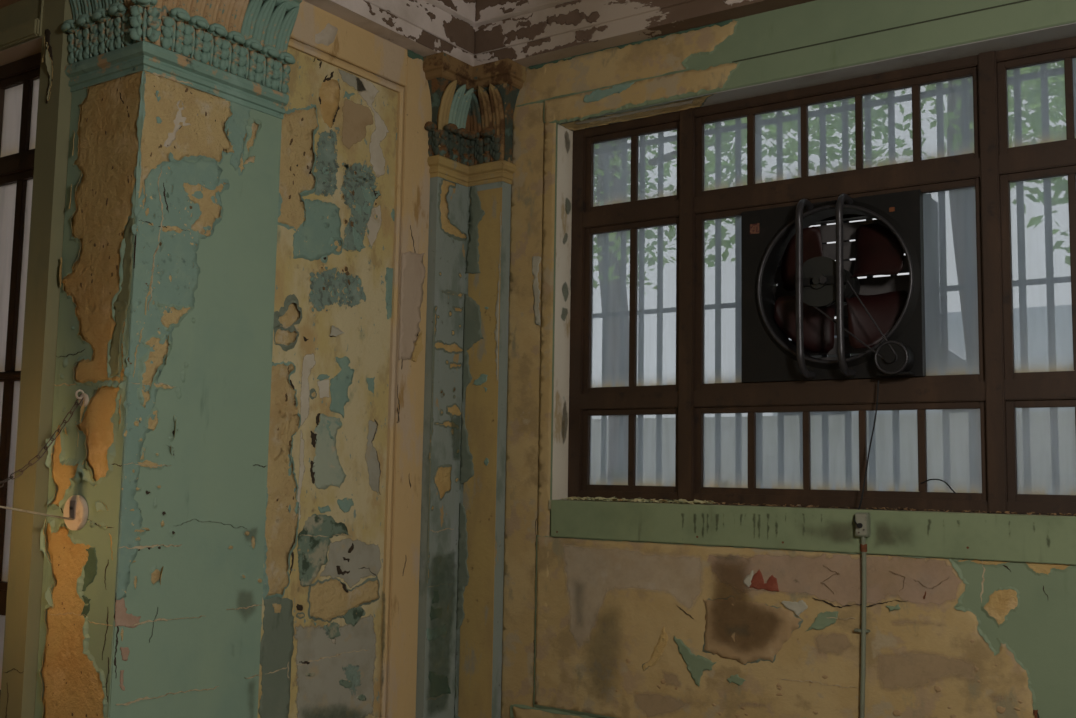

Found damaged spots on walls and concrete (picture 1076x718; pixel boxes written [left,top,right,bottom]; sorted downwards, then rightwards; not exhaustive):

peeling [38,70,262,718]
crack [87,519,246,705]
peeling [240,70,397,600]
peeling [295,539,382,718]
peeling [363,0,1076,718]
damp [714,565,776,648]